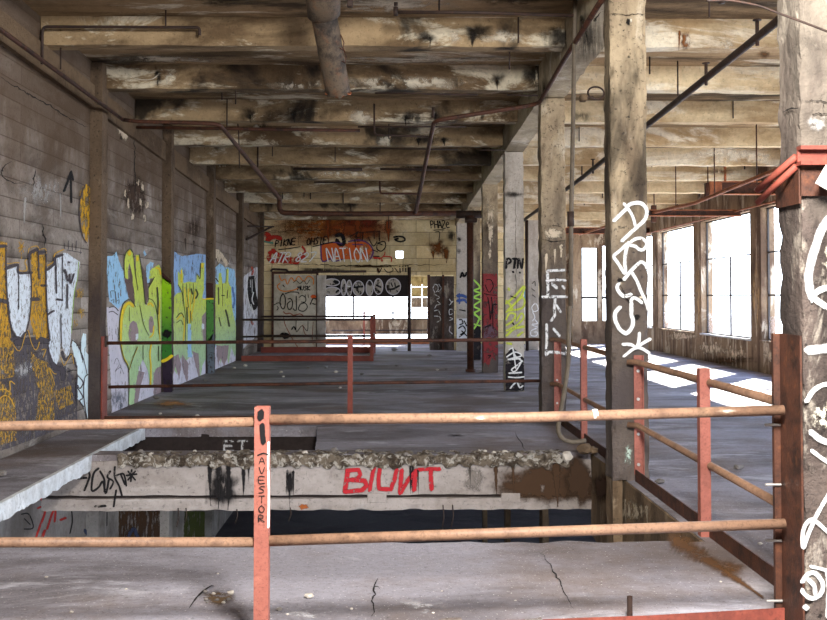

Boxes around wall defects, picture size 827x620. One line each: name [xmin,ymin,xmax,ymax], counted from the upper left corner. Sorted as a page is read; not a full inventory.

leakage [404,78,444,87]
corrosion [281,220,392,244]
corrosion [429,240,449,263]
spalling [117,449,254,470]
spalling [270,447,570,491]
corrosion [494,456,607,507]
crack [371,578,380,615]